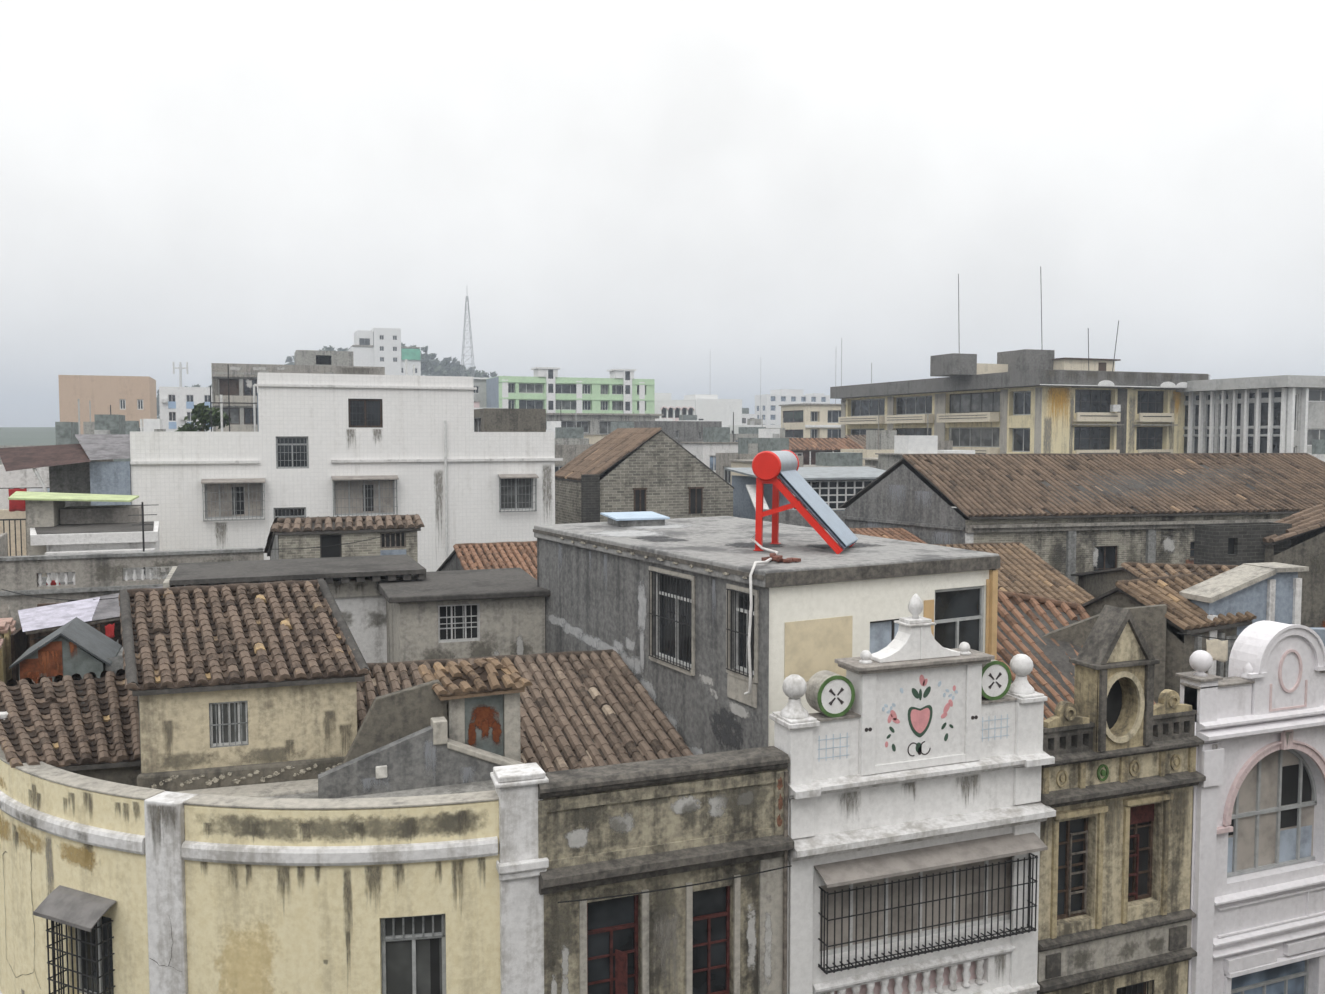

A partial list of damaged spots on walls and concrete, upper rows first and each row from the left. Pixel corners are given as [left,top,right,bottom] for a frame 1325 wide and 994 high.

leakage [1044,370,1210,454]
leakage [204,811,477,838]
leakage [278,866,320,891]
leakage [366,865,403,891]
leakage [438,861,463,891]
crack [3,851,41,989]
leakage [344,871,352,964]